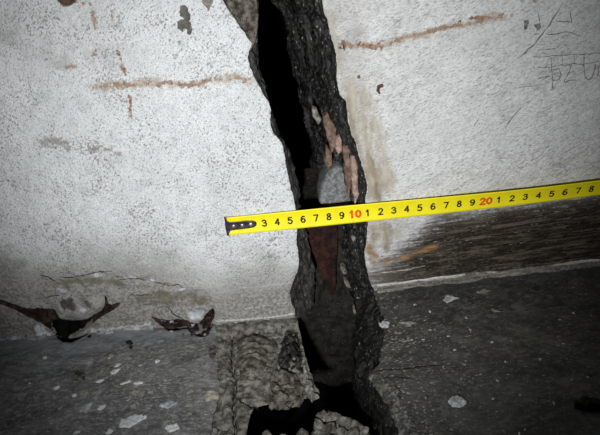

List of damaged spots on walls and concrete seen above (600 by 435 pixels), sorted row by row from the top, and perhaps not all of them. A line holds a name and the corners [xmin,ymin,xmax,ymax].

rust [337,13,504,50]
rust [95,50,136,117]
rust [145,77,221,89]
crack [248,0,367,211]
water stain [361,153,394,202]
water stain [368,220,391,257]
spalling [0,296,120,343]
crack [230,222,441,435]
spalling [152,306,319,435]